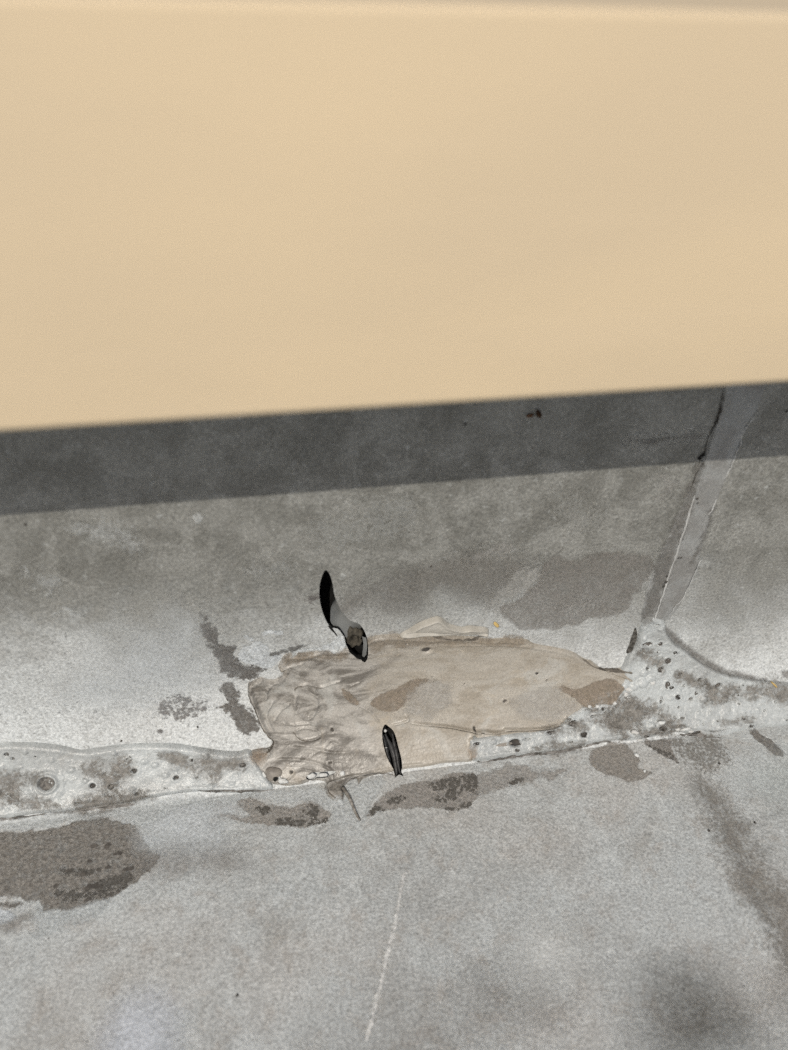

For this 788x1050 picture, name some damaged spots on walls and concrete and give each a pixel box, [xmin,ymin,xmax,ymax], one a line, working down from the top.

crack [690,389,724,491]
crack [626,628,637,653]